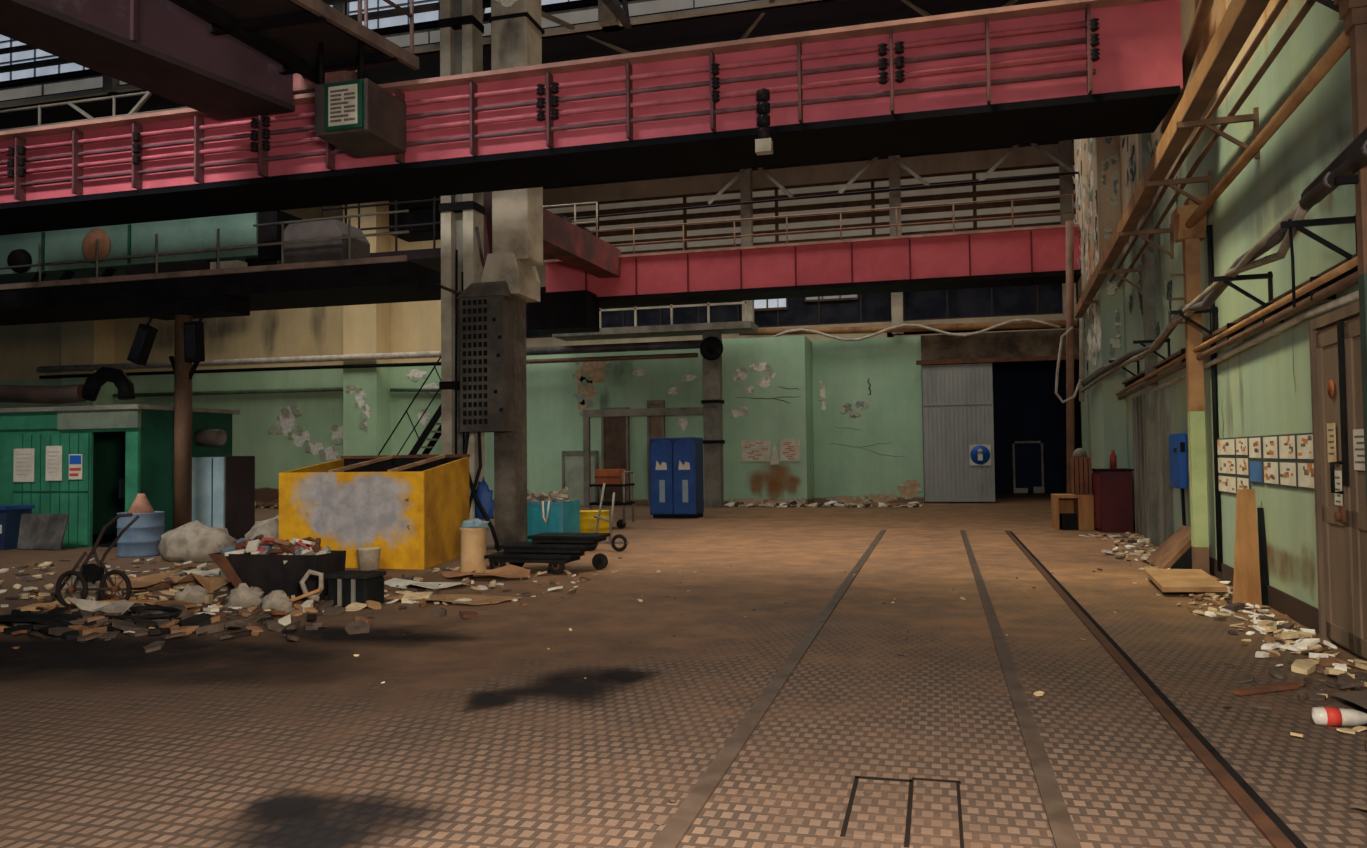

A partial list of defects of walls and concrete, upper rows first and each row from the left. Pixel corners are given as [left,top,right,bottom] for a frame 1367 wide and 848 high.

peeling [572,361,612,415]
peeling [729,361,776,418]
peeling [268,383,371,462]